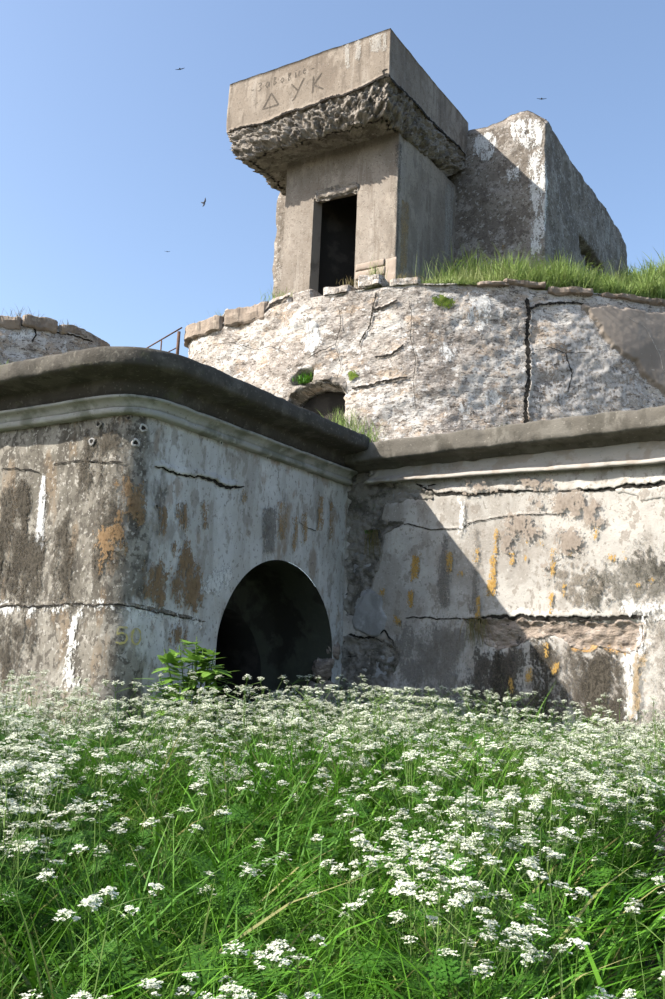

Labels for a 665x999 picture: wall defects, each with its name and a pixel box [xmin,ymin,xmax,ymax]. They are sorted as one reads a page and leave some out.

spalling [227,77,466,196]
efflorescence [506,118,548,258]
crack [286,292,416,406]
crack [523,298,584,423]
crack [404,473,665,530]
water stain [0,475,114,690]
spalling [262,635,401,734]
rust [407,555,420,608]
crack [343,607,649,659]
rust [473,527,527,618]
water stain [388,530,665,737]
spalling [468,617,645,654]